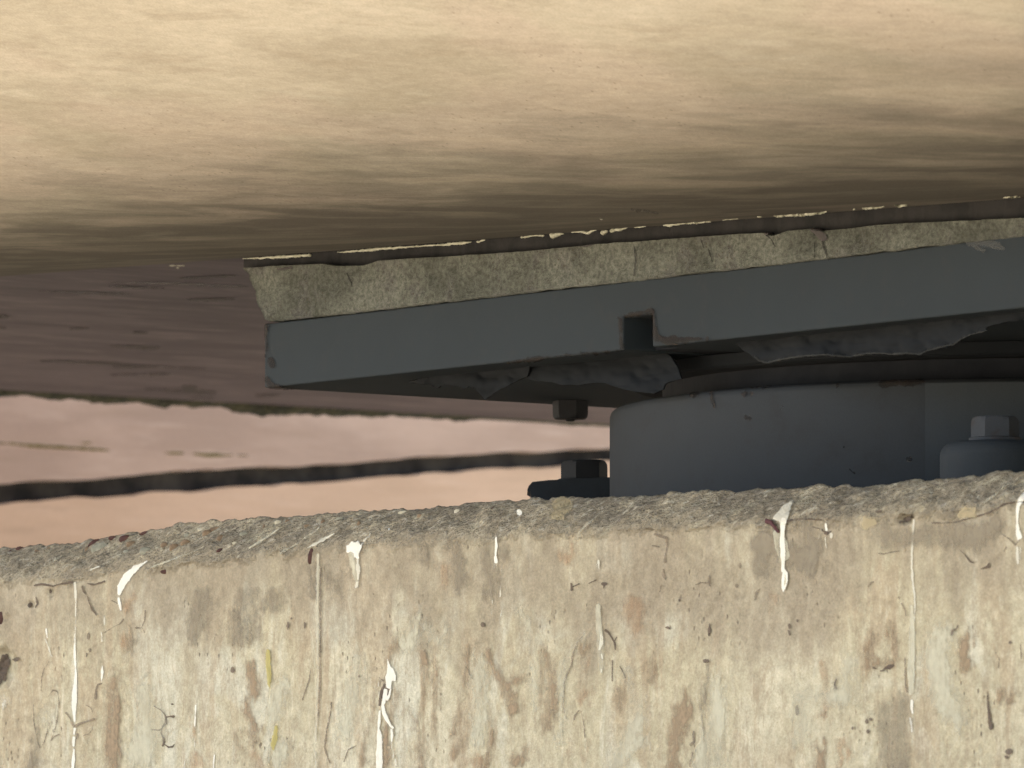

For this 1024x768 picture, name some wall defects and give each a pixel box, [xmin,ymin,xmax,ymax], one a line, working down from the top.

peeling [521,219,646,239]
peeling [339,239,485,253]